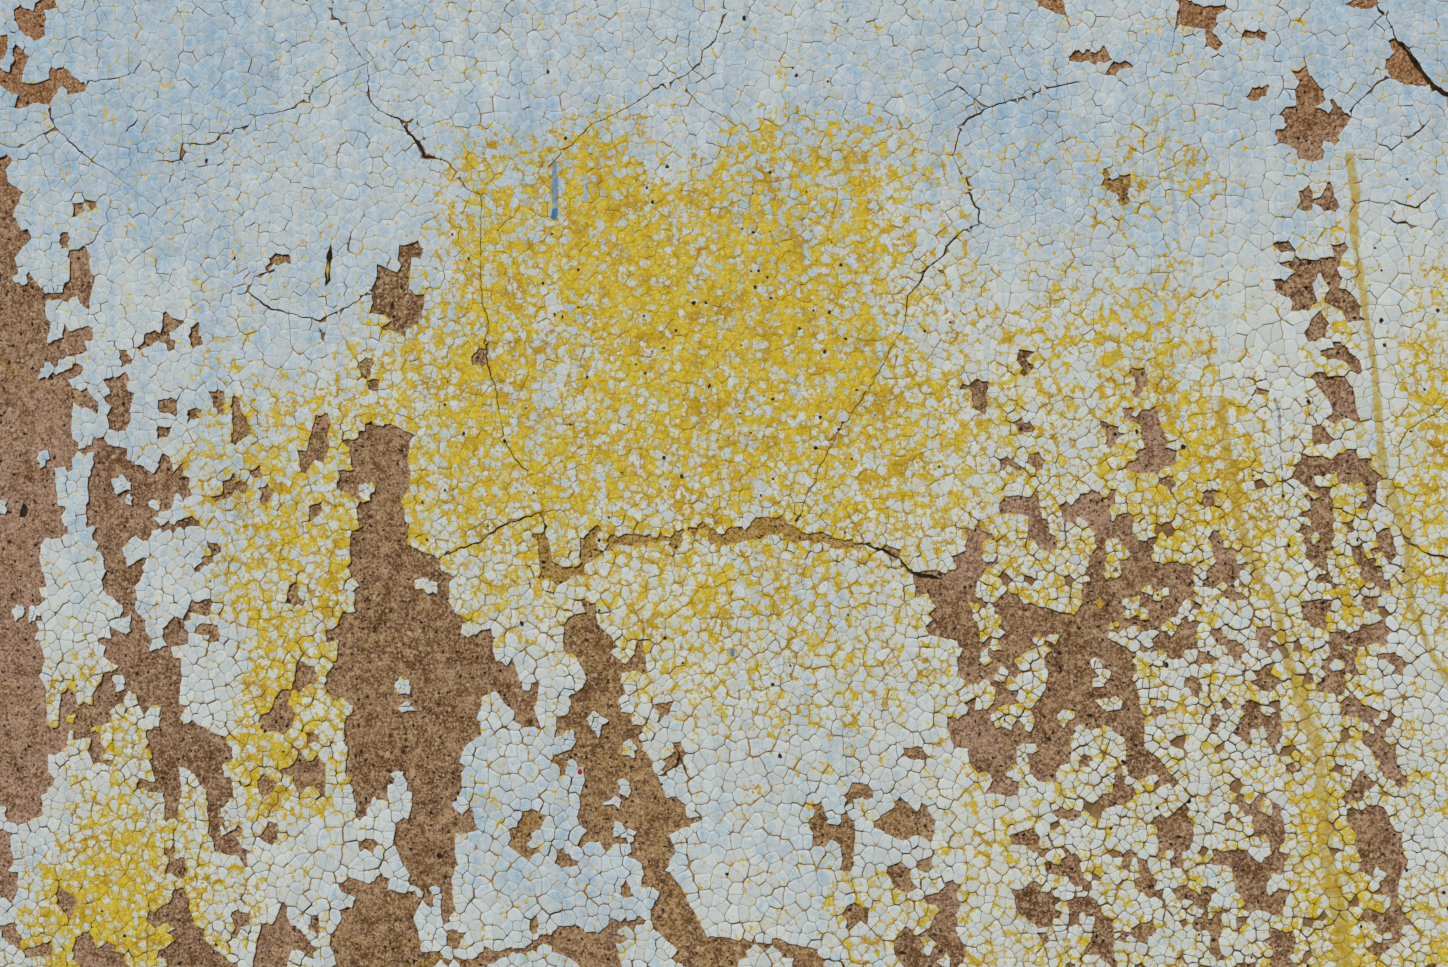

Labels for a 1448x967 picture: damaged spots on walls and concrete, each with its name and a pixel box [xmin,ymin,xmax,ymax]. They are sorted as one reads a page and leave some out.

peeling [0,0,87,110]
crack [550,2,736,165]
peeling [1175,0,1225,56]
peeling [1246,67,1361,214]
crack [1327,5,1448,150]
peeling [1378,38,1440,93]
crack [160,8,532,474]
crack [795,82,1076,521]
crack [441,512,546,557]
peeling [0,154,1307,967]
crack [861,543,942,579]
peeling [1269,231,1421,958]